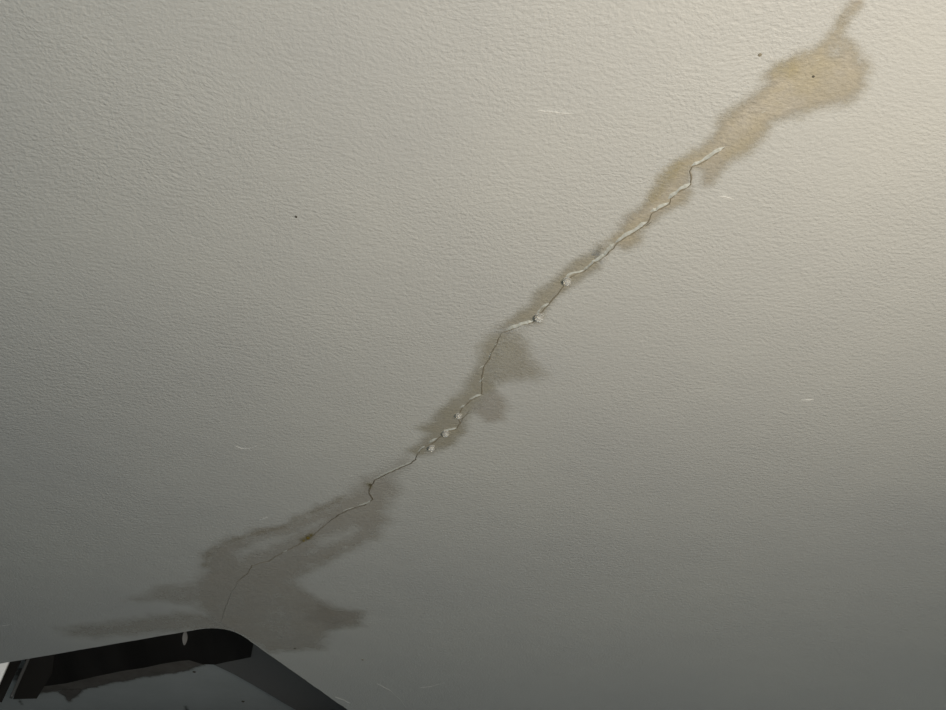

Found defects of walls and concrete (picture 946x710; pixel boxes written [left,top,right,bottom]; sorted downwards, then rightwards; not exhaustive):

damp [189,483,392,650]
crack [222,147,724,619]
damp [412,25,865,454]